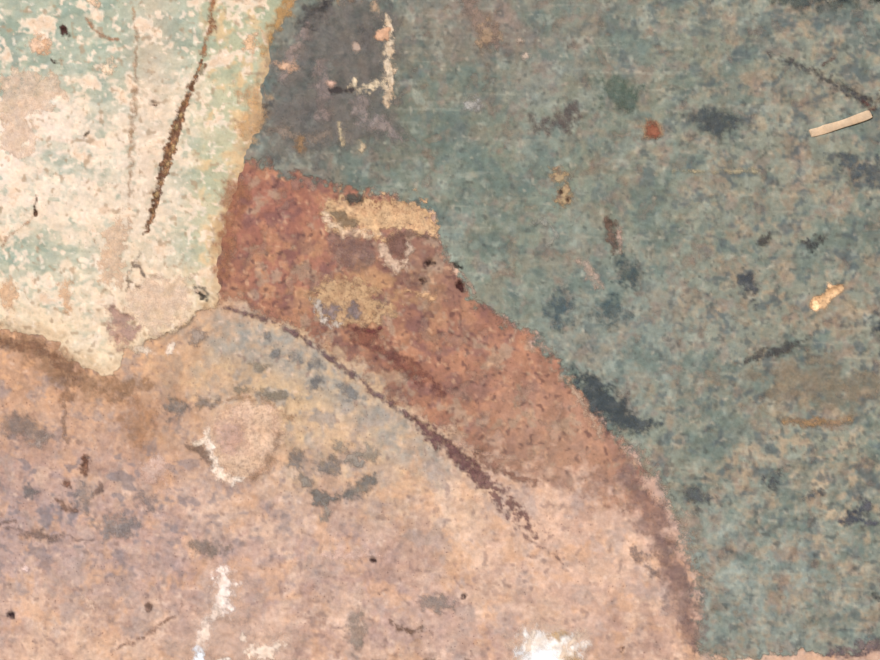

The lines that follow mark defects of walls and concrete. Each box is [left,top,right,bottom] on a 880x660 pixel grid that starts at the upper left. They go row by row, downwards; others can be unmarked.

crack [145,0,217,232]
peeling [97,208,132,287]
flaking render [320,188,440,275]
peeling [59,281,71,313]
flaking render [107,305,151,355]
flaking render [308,266,397,335]
water stain [194,566,238,660]
water stain [240,633,287,660]
water stain [510,622,589,660]